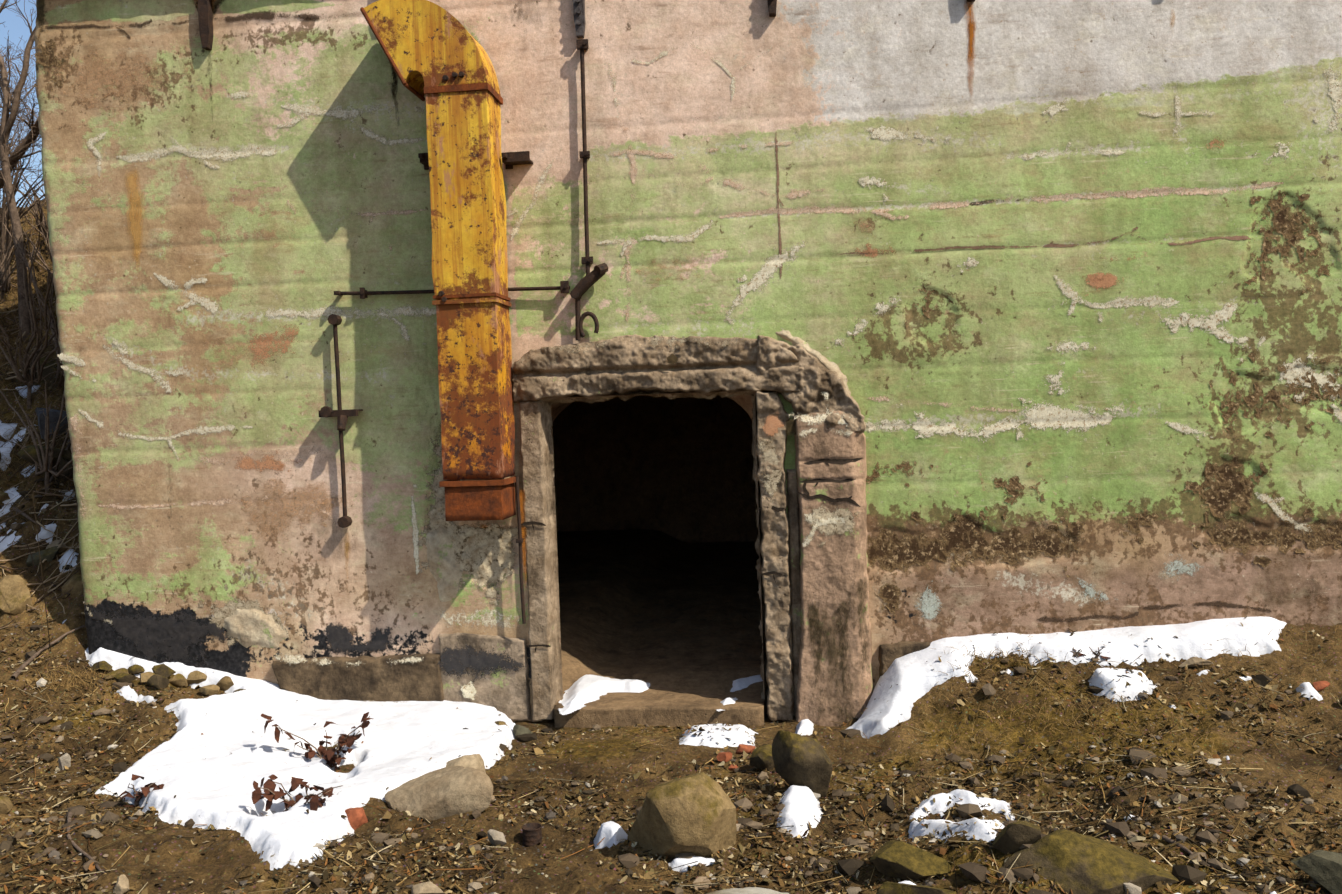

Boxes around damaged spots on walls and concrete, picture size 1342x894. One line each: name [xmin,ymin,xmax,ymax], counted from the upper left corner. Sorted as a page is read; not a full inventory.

water stain [195,0,224,14]
rust [966,1,975,65]
spalling [1238,190,1337,295]
peeling [833,284,954,348]
crack [758,392,1040,547]
spalling [1159,301,1342,577]
crack [761,571,786,583]